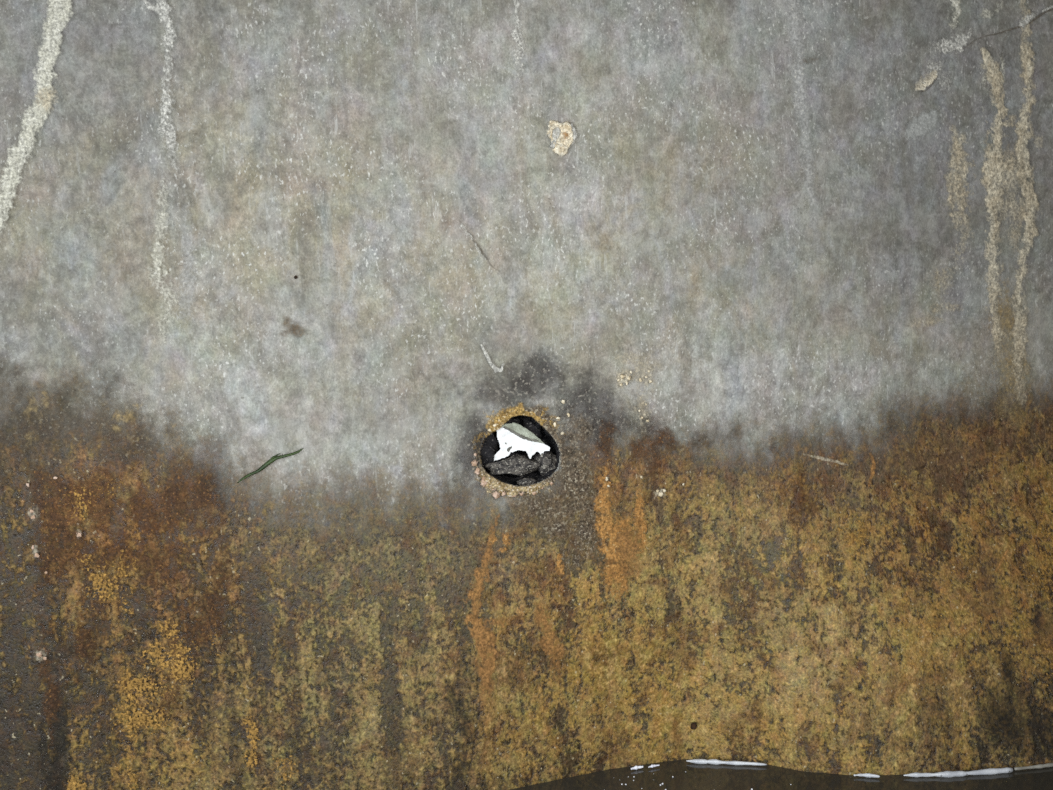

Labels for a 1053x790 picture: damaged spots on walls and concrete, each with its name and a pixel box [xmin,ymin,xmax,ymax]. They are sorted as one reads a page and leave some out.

leakage [0,0,73,230]
spalling [547,120,577,156]
leakage [927,0,972,84]
leakage [947,129,975,226]
leakage [981,41,1041,393]
crack [979,6,1053,39]
corrosion [465,516,513,697]
leakage [0,354,1053,790]
spalling [471,399,599,568]
corrosion [594,427,656,600]